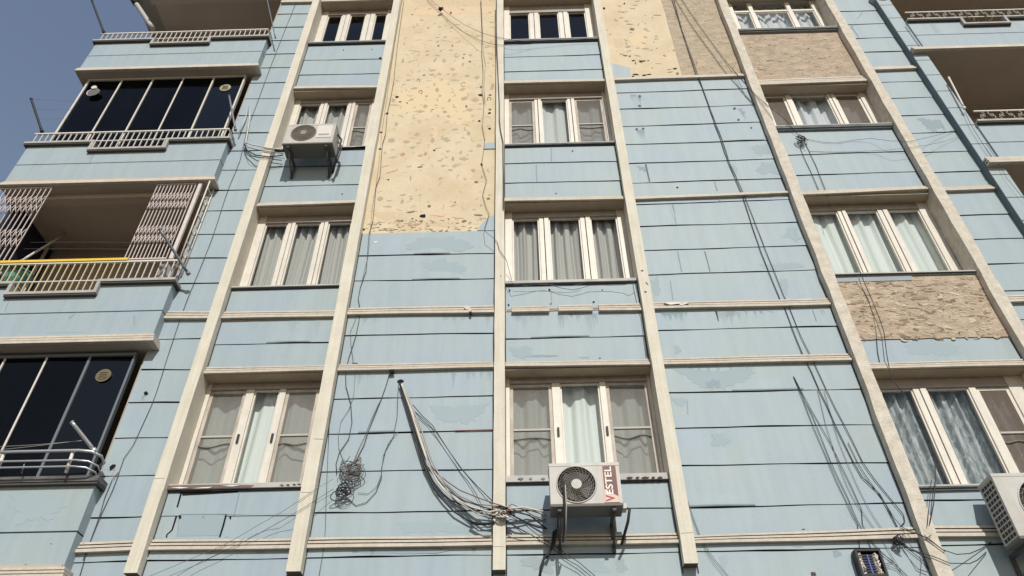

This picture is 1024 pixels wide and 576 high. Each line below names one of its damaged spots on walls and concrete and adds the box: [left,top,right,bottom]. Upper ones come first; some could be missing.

spalling [600,0,867,84]
spalling [363,0,497,243]
spalling [836,274,1011,342]